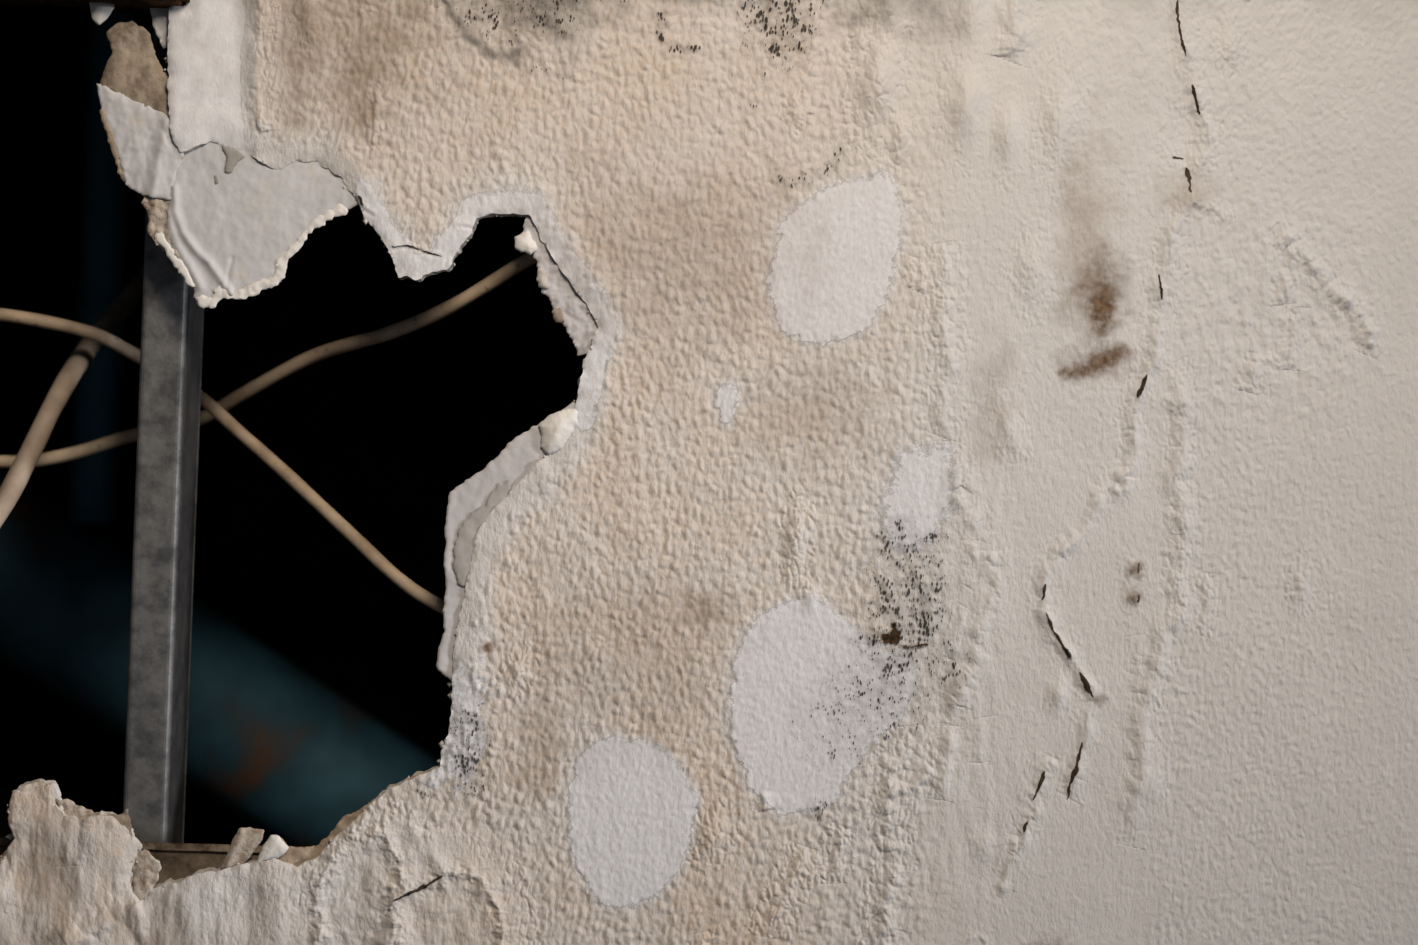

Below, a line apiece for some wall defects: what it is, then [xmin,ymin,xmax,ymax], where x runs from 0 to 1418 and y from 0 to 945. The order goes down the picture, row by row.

peeling [150,0,307,168]
spalling [141,196,195,287]
peeling [343,174,619,445]
corrosion [1093,285,1115,334]
corrosion [1060,346,1129,376]
crack [990,0,1389,892]
peeling [363,657,502,812]
spalling [0,779,142,863]
flaking render [133,827,333,894]